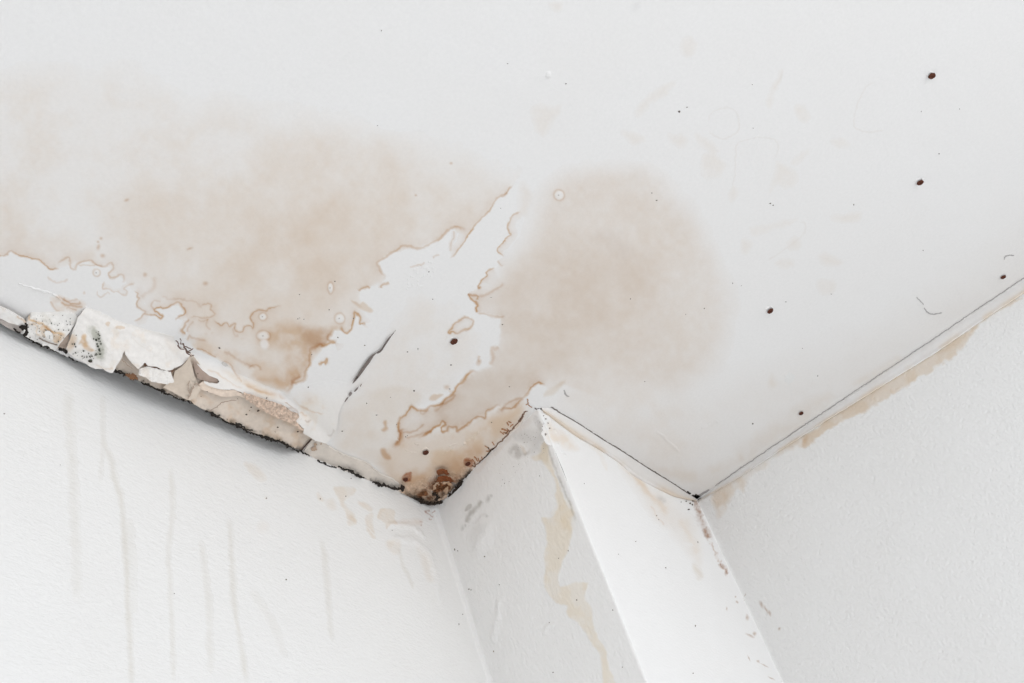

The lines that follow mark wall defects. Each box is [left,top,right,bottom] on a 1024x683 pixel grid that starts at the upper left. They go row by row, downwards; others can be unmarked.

flaking render [23,311,78,350]
rust [380,399,543,506]
leakage [0,58,1024,604]
leakage [507,416,706,683]